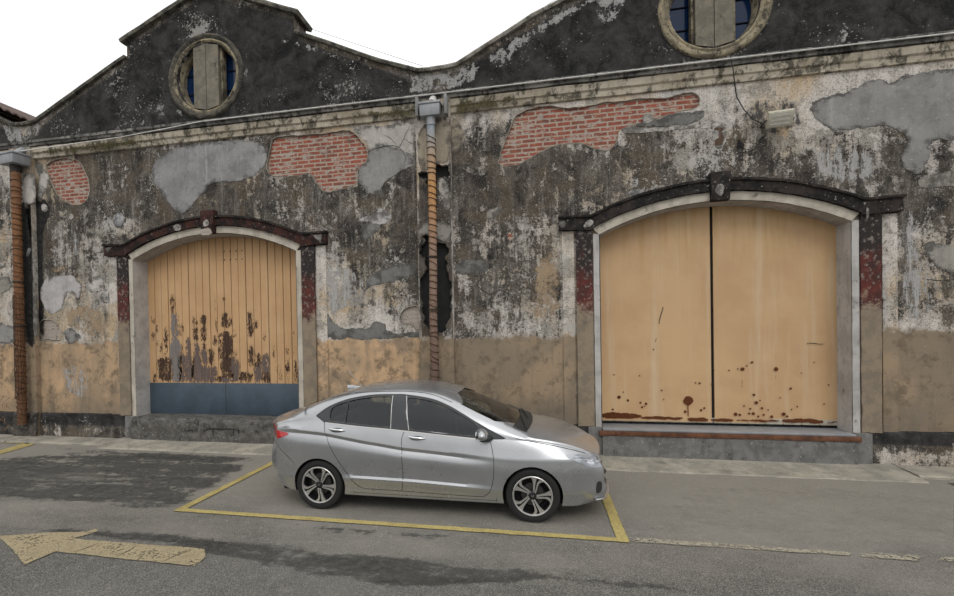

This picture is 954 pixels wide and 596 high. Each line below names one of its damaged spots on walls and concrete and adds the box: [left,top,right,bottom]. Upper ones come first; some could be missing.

flaking render [266,130,368,193]
flaking render [498,92,727,167]
flaking render [26,157,90,266]
damp [22,199,65,347]
damp [532,252,561,316]
peeling [151,294,298,383]
rust [599,391,862,442]